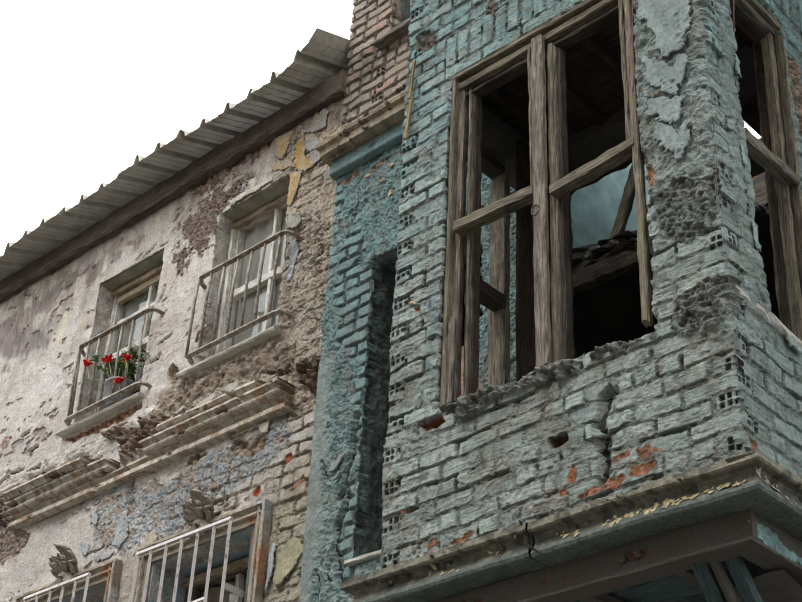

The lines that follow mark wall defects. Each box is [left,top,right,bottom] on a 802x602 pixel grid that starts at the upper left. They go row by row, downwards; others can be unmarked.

peeling [634,0,692,161]
flaking render [168,108,329,282]
flaking render [65,405,142,442]
flaking render [187,453,206,466]
flaking render [228,420,271,457]
flaking render [560,465,577,496]
crack [600,393,619,478]
flaking render [577,444,662,499]
crack [317,418,360,602]
flaking render [0,528,30,566]
peeling [80,514,129,562]